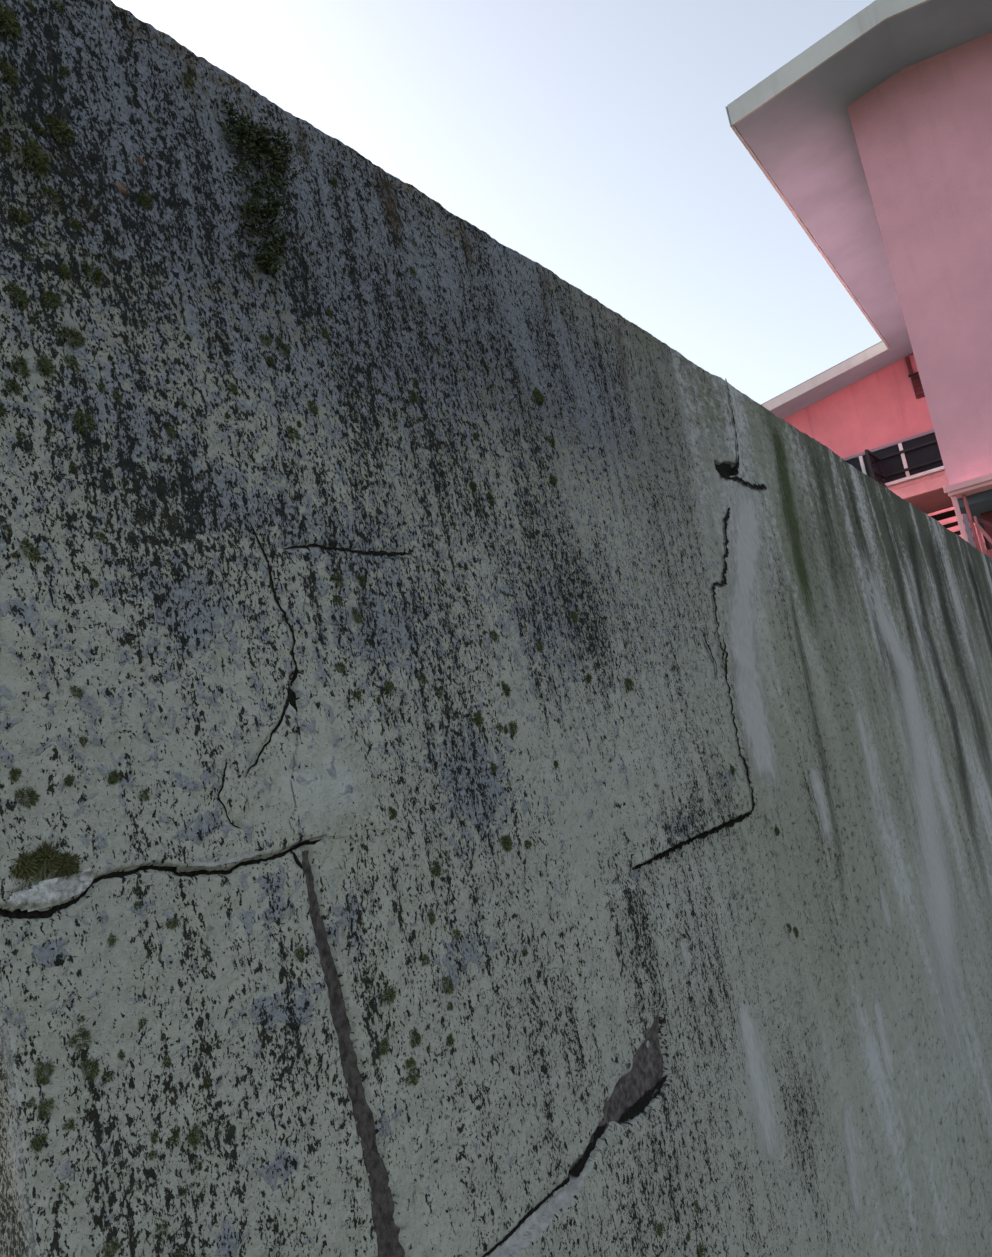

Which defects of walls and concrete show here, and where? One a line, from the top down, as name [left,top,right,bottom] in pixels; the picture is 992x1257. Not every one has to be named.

water stain [773,433,810,604]
crack [0,523,412,1257]
crack [632,378,767,1004]
water stain [812,761,829,836]
water stain [851,496,973,1006]
water stain [931,545,989,759]
spalling [482,1013,670,1257]
water stain [740,1008,775,1154]